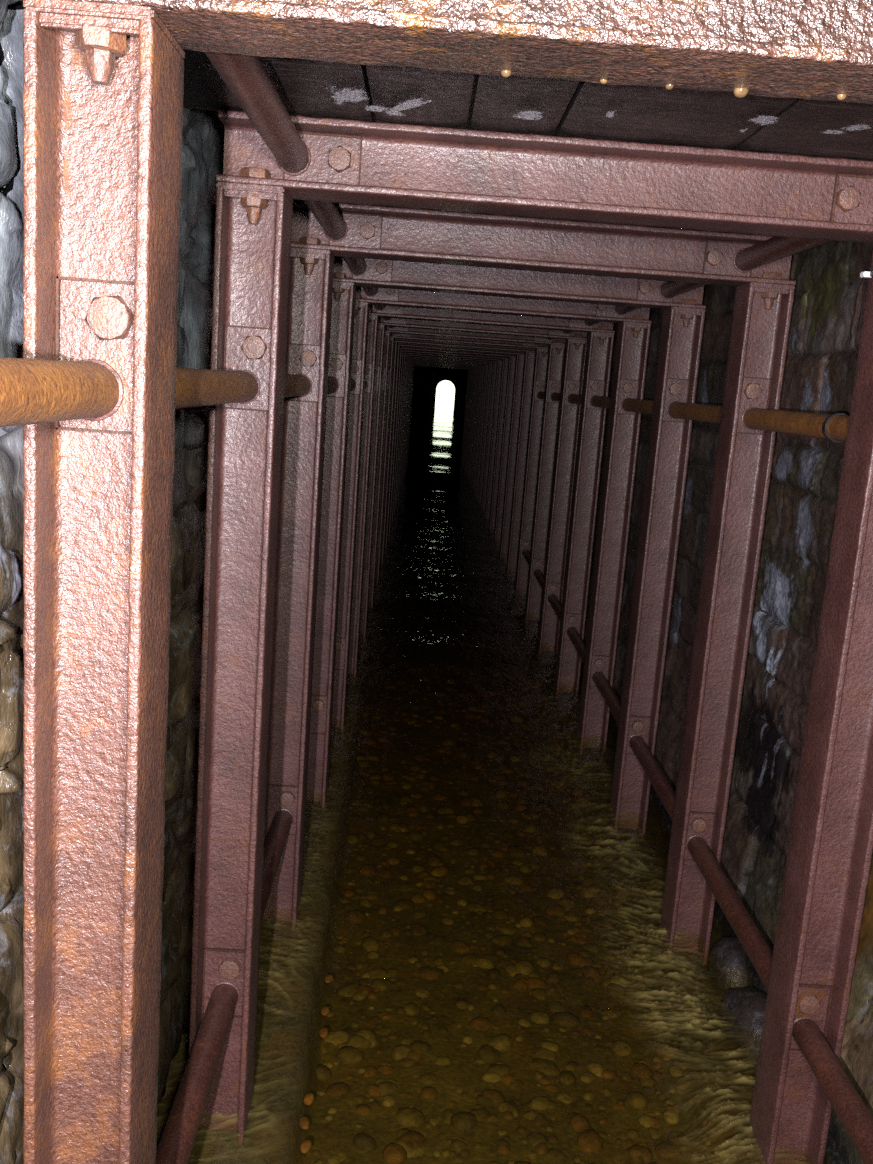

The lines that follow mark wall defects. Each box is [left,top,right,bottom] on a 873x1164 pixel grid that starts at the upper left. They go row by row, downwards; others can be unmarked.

leakage [326,85,432,116]
leakage [740,116,778,132]
leakage [823,124,871,134]